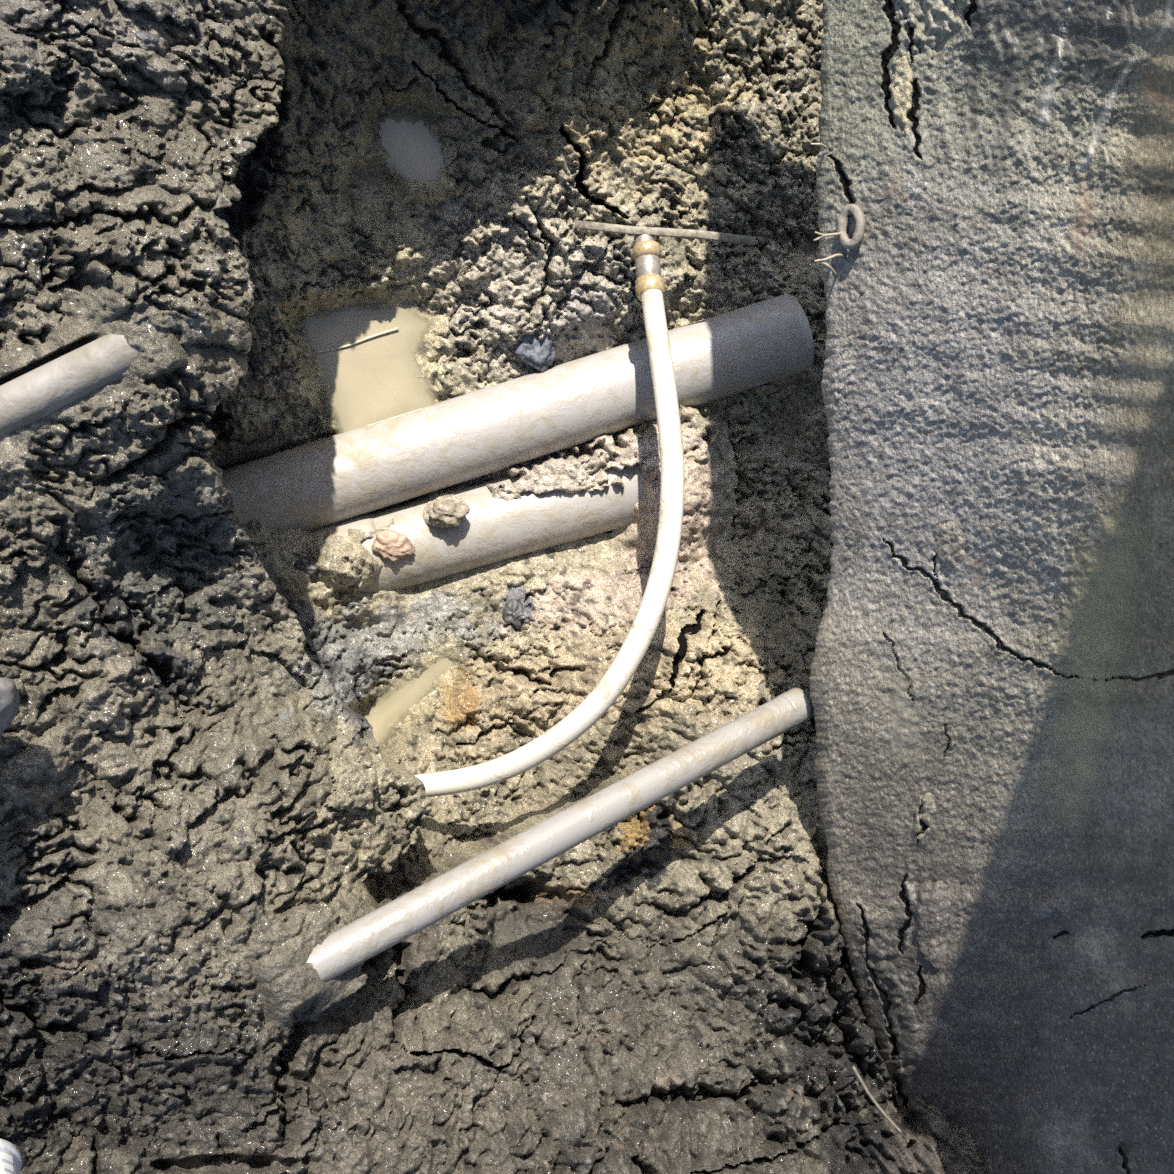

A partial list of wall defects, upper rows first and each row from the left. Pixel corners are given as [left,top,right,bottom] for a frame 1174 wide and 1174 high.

spalling [883,0,983,158]
crack [884,633,914,703]
crack [883,540,1174,682]
crack [943,724,951,757]